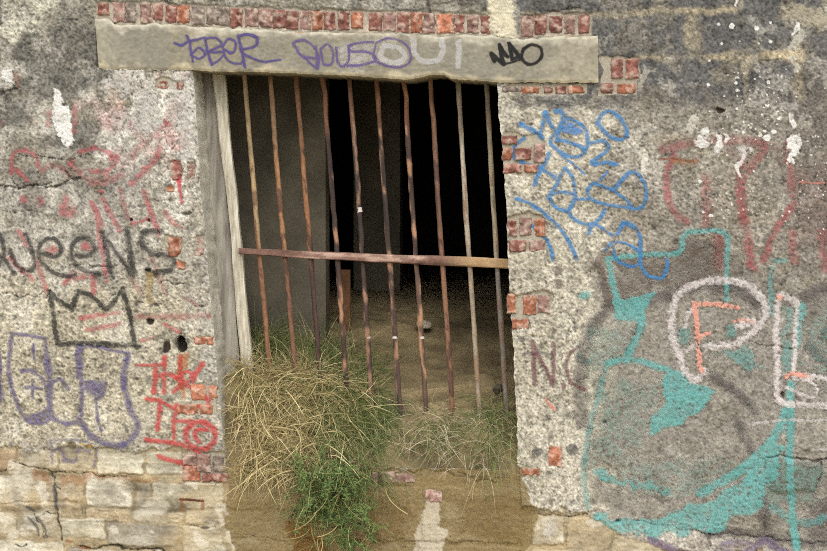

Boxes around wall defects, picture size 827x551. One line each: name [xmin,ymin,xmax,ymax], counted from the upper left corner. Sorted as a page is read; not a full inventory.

spalling [502,83,587,96]
spalling [598,56,641,96]
peeling [52,88,75,147]
crack [1,154,90,190]
spalling [501,132,546,177]
spalling [507,211,548,255]
spalling [180,450,228,483]
crack [5,463,104,550]